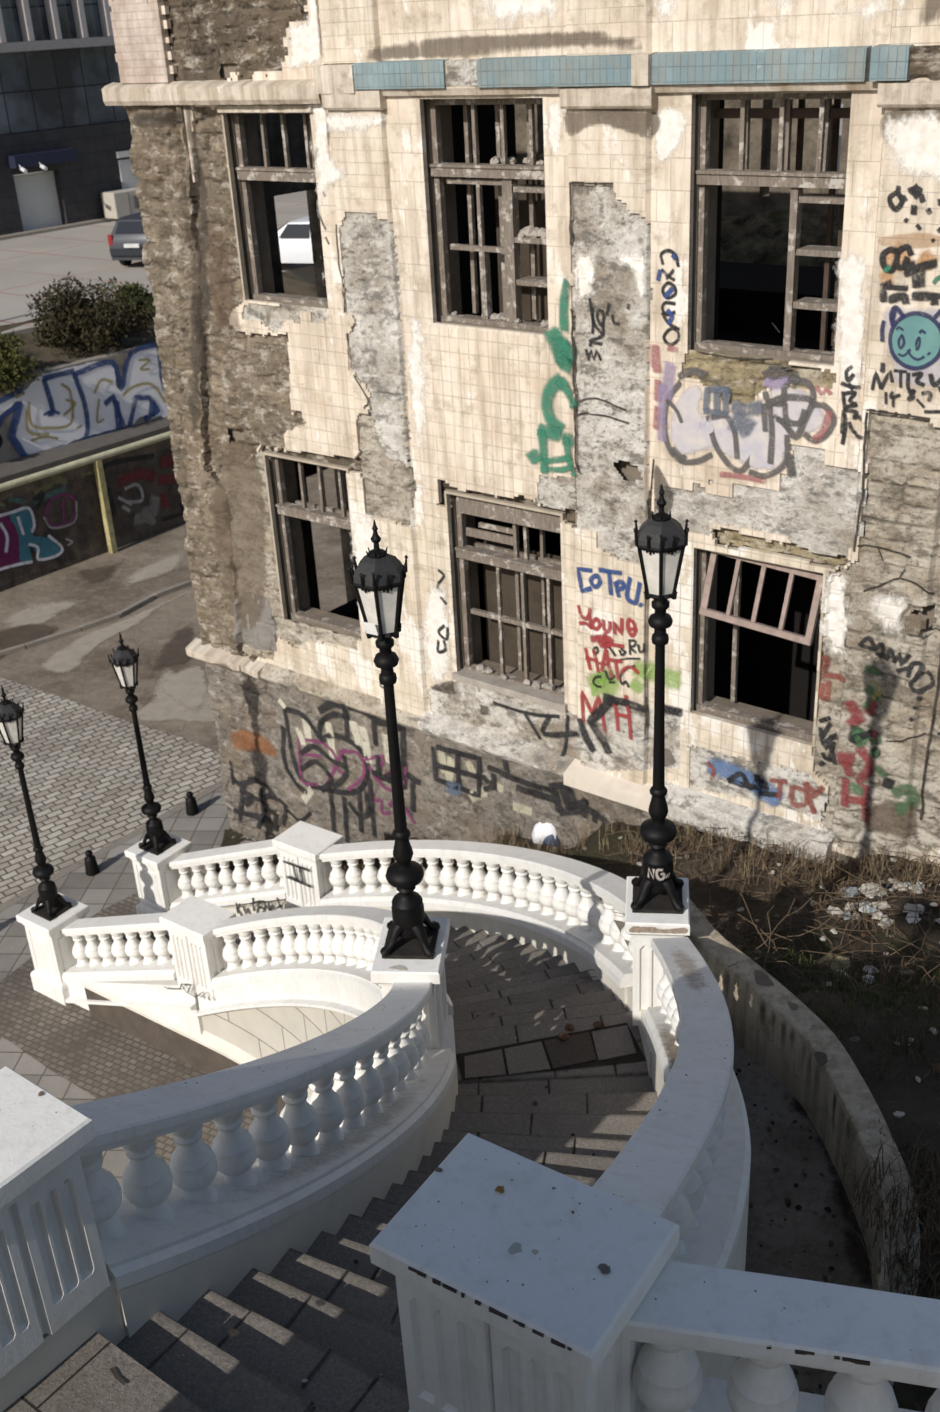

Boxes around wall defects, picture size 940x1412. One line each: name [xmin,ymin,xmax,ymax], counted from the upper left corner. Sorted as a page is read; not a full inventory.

spalling [164,0,309,81]
water stain [371,32,632,59]
water stain [925,0,940,20]
spalling [192,105,417,660]
spalling [428,182,940,857]